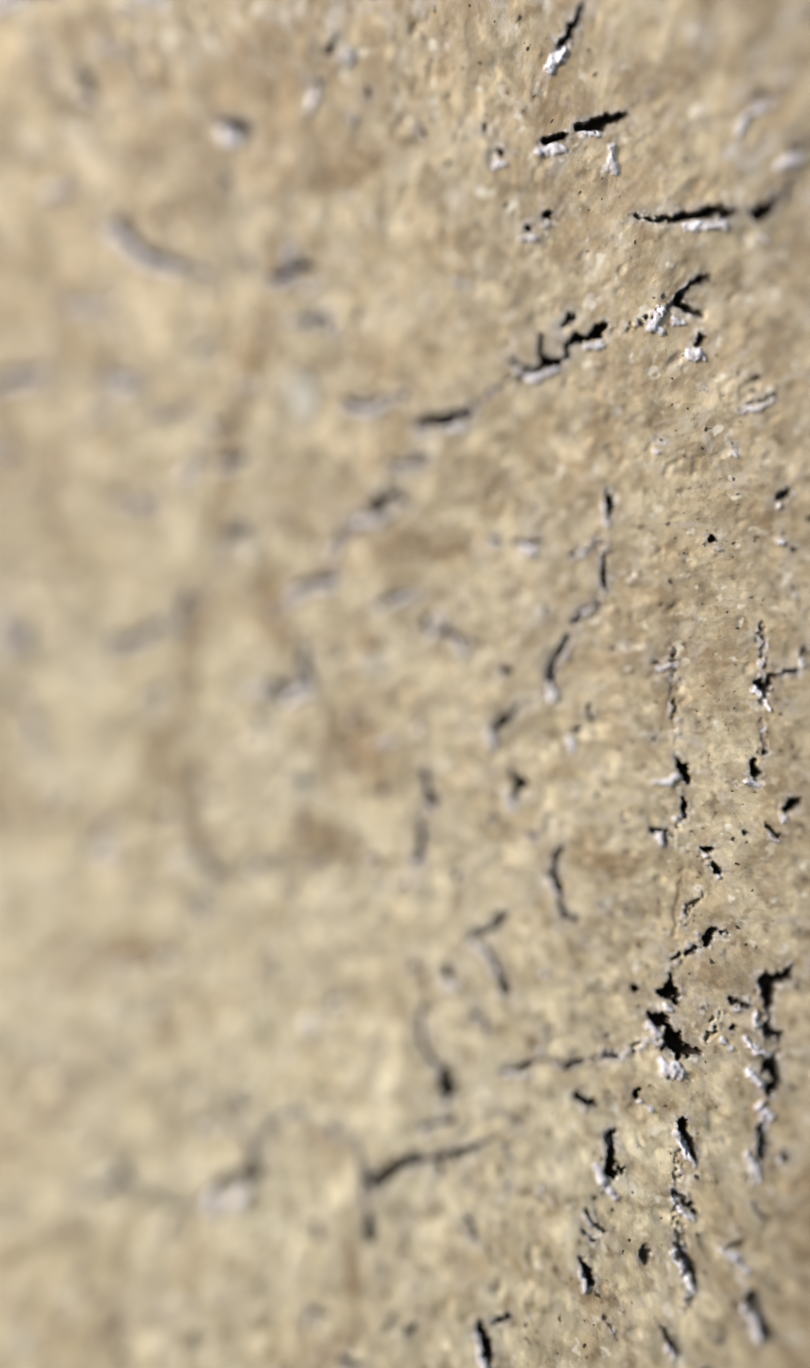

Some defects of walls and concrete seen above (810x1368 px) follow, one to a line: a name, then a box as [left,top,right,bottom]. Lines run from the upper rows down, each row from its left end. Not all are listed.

crack [637,138,810,244]
crack [107,214,212,278]
crack [331,273,711,559]
crack [486,492,615,754]
crack [410,770,440,868]
crack [469,911,512,1031]
crack [501,759,793,1344]
crack [206,1114,263,1214]
crack [353,1004,517,1244]
crack [386,1322,418,1341]
crack [474,1313,513,1368]
crack [660,1326,709,1368]